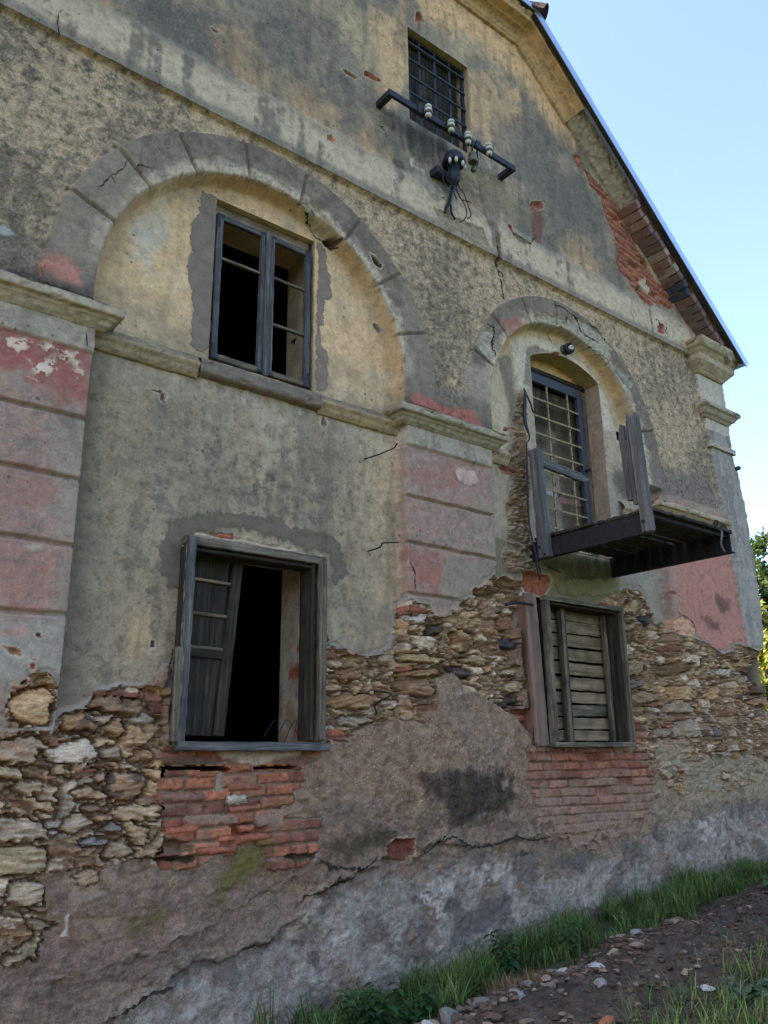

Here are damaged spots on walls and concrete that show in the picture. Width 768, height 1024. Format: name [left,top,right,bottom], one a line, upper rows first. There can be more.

crack [97,160,149,190]
crack [495,236,538,299]
flaking render [573,154,737,367]
peeling [6,326,84,382]
crack [548,305,624,384]
flaking render [0,393,768,968]
crack [414,834,550,854]
crack [296,856,378,907]
crack [108,987,175,1021]